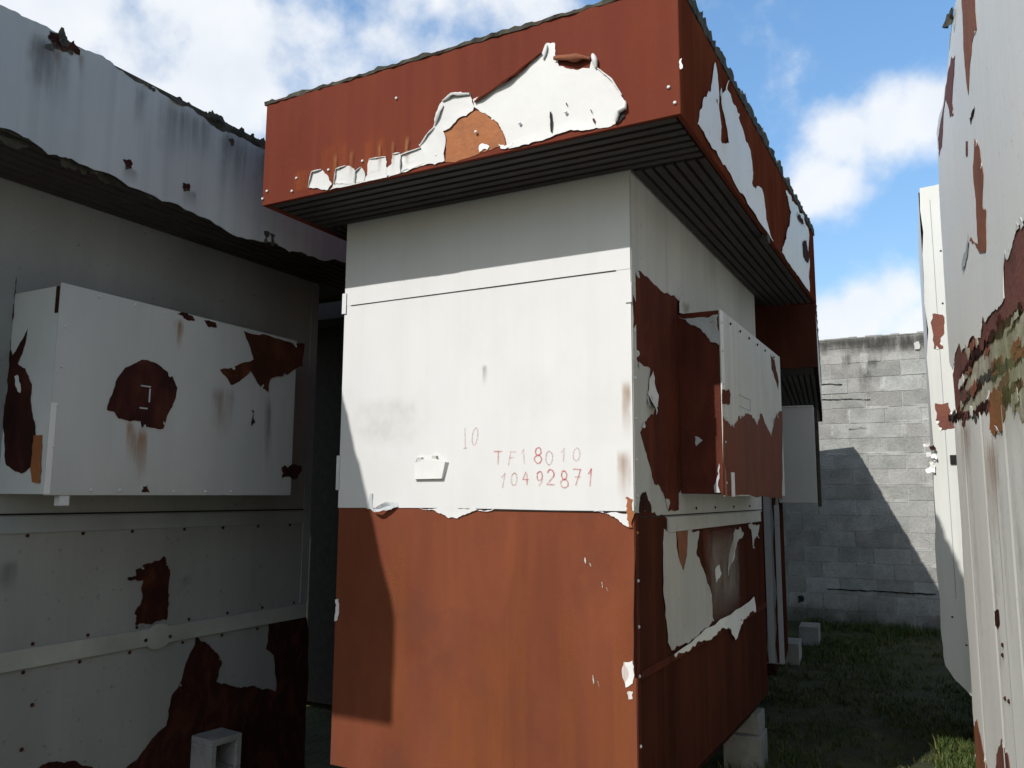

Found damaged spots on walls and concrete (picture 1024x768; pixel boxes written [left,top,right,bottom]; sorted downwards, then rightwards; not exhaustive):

peeling [308,43,627,190]
peeling [698,63,810,292]
corrosion [3,329,42,483]
corrosion [107,360,177,441]
corrosion [220,331,305,392]
peeling [679,294,720,345]
corrosion [935,218,1024,436]
peeling [420,506,493,518]
peeling [593,511,629,527]
corrosion [128,556,170,625]
peeling [663,522,759,657]
corrosion [126,616,309,768]